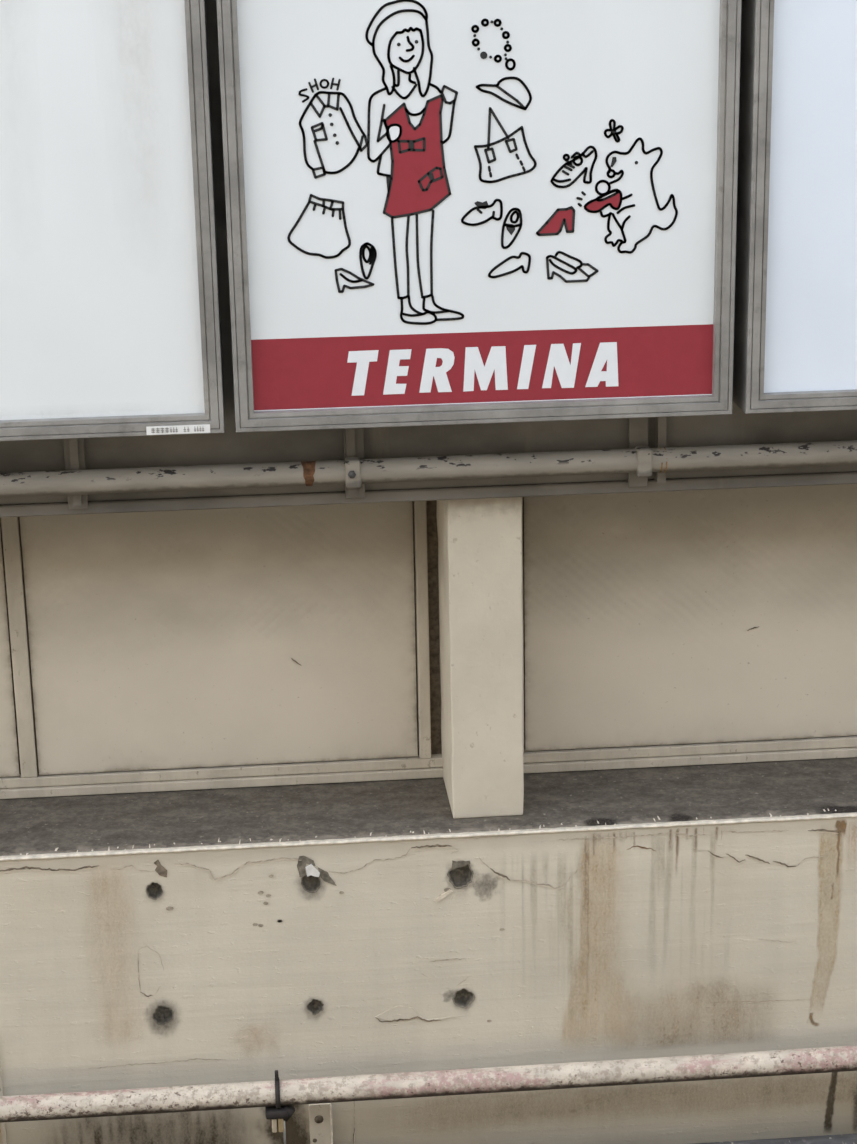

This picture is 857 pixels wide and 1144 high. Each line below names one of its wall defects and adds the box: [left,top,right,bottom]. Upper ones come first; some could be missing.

crack [0,865,146,873]
crack [175,857,298,882]
spalling [297,856,344,894]
crack [329,824,839,890]
rust [836,820,855,874]